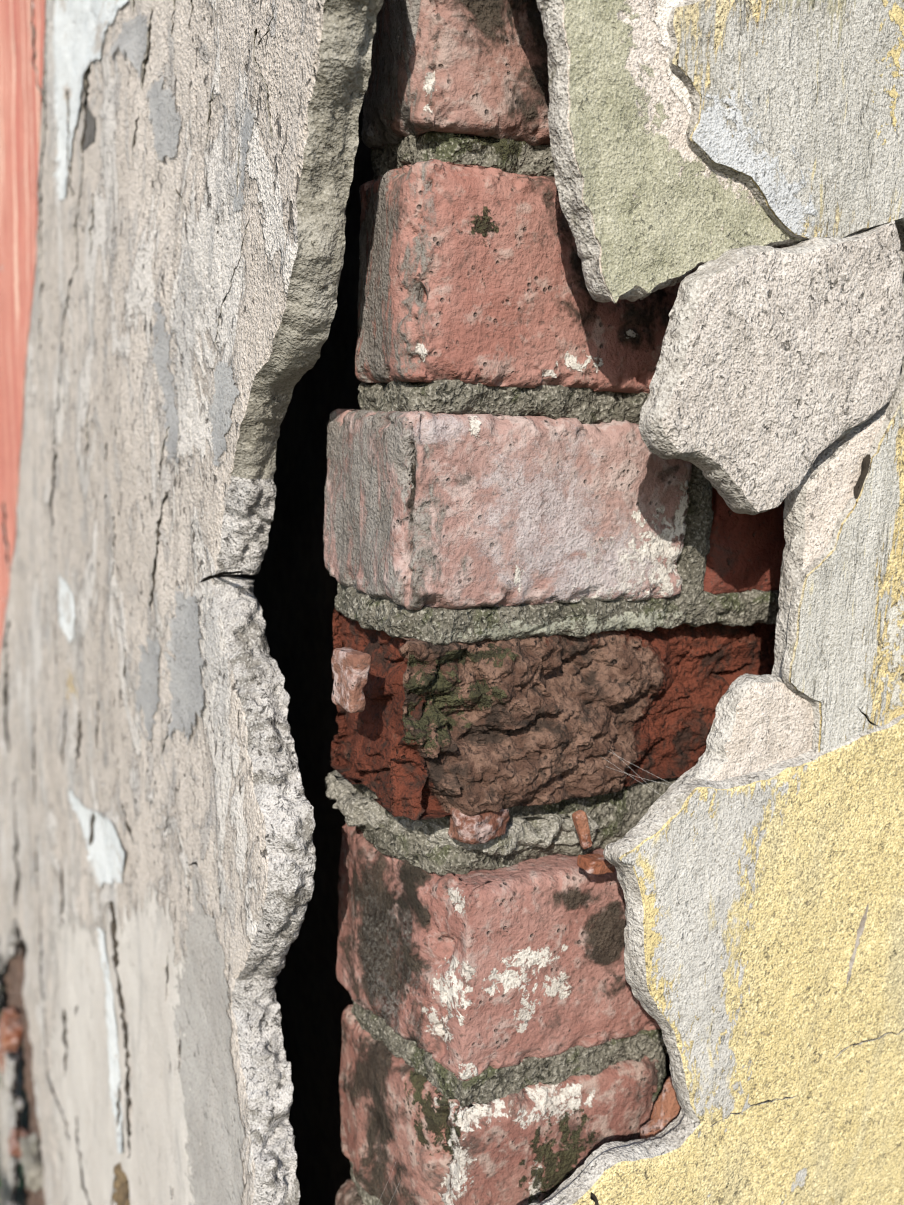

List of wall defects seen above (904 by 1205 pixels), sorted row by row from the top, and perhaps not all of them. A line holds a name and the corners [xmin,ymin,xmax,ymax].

peeling [648,0,904,239]
crack [32,5,107,526]
crack [150,434,168,610]
crack [3,620,99,1205]
peeling [69,791,124,888]
peeling [2,883,203,1205]
crack [109,901,132,1157]
damp [351,866,572,1049]
damp [458,1063,478,1081]
spalling [330,608,776,820]
peeling [621,405,904,1138]
crack [590,1192,599,1205]